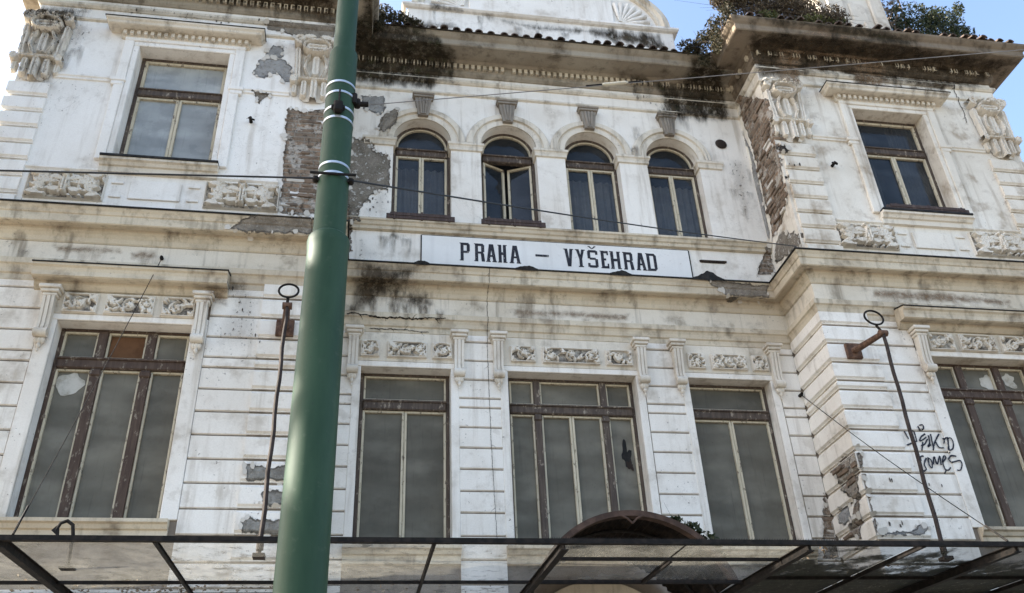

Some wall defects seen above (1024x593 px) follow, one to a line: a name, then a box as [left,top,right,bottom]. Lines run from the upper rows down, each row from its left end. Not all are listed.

spalling [251,18,335,104]
damp [355,0,453,89]
damp [561,28,663,49]
damp [632,58,728,120]
spalling [278,106,325,219]
spalling [347,94,400,252]
spalling [736,94,804,277]
damp [355,246,428,312]
crack [347,312,445,333]
spalling [238,461,285,536]
spalling [821,443,931,559]